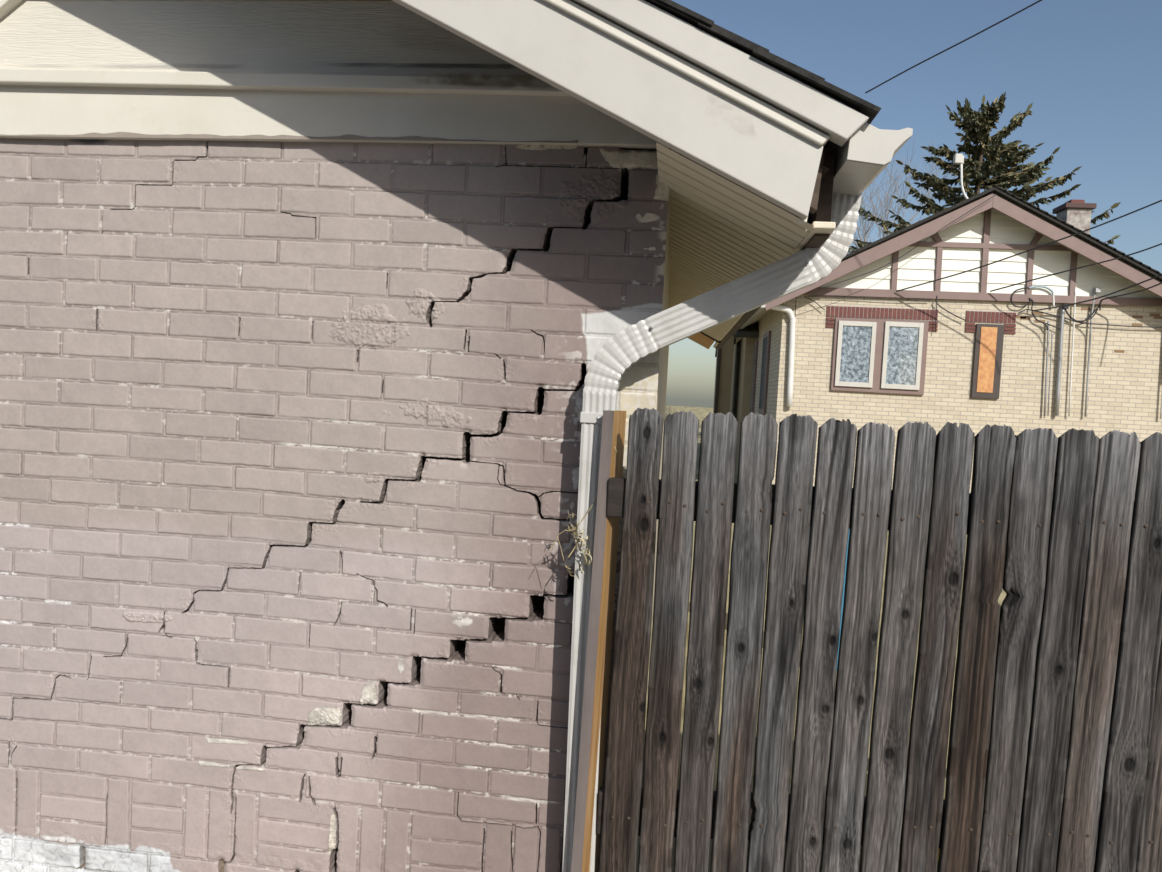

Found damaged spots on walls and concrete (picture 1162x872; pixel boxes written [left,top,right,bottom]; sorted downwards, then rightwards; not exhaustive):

crack [102,141,208,234]
crack [281,212,316,238]
crack [426,146,629,327]
crack [463,330,506,380]
crack [158,363,587,872]
crack [0,634,128,836]
spalling [308,707,341,726]
spalling [359,682,378,705]
peeling [28,835,84,843]
crack [102,792,110,845]
peeling [328,814,337,855]